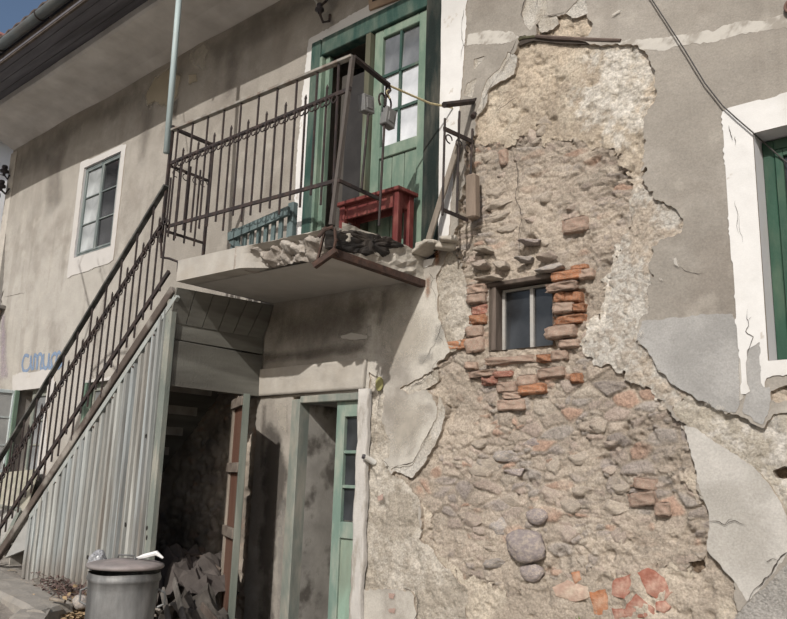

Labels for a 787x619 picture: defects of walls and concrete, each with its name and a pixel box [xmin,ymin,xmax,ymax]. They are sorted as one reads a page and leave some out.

peeling [146,44,208,116]
spalling [245,227,329,273]
spalling [342,222,382,242]
spalling [350,245,427,279]
spalling [364,0,739,619]
peeling [742,342,773,425]
damp [259,407,287,619]